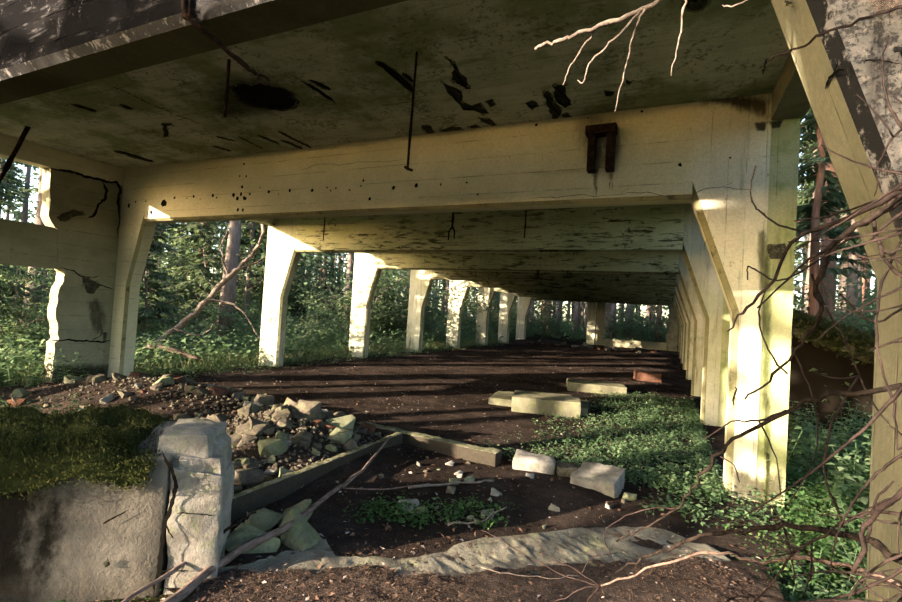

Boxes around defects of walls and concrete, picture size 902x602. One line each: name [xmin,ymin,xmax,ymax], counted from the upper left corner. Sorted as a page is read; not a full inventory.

spalling [375,61,413,90]
spalling [420,56,497,134]
spalling [527,83,572,119]
crack [51,168,122,237]
crack [52,334,111,343]
damp [89,299,107,342]
crack [153,451,215,596]